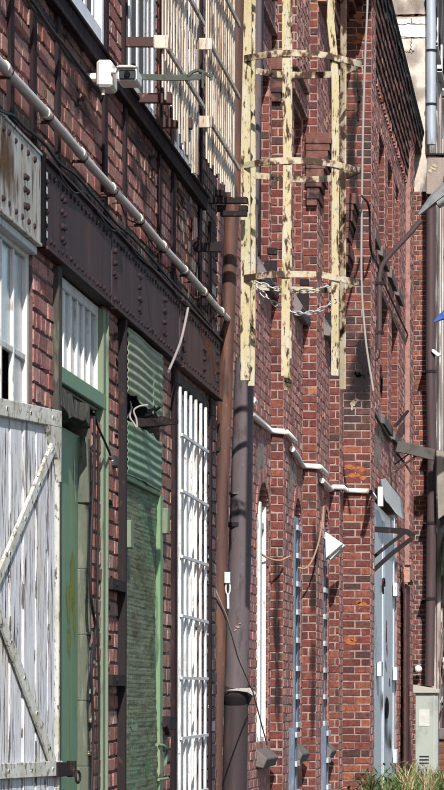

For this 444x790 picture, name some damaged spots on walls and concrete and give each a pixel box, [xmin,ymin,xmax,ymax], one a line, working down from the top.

corrosion [0,119,18,209]